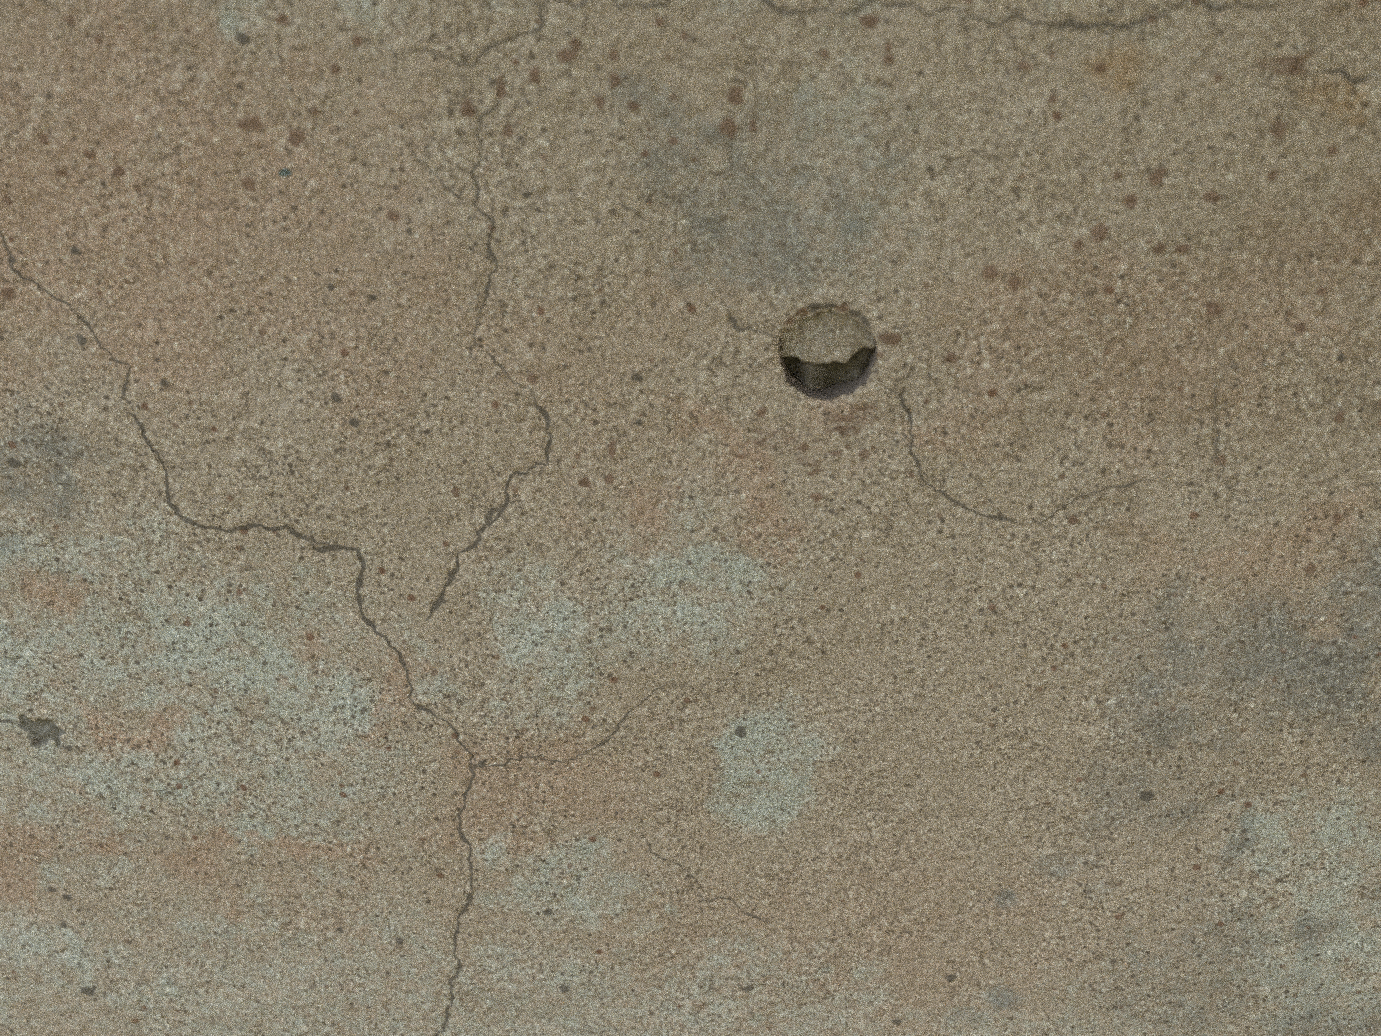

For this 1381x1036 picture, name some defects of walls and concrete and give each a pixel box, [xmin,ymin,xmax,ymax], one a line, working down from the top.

crack [757,0,1290,86]
crack [1302,67,1381,86]
crack [396,0,672,622]
crack [720,301,783,338]
spalling [792,300,873,330]
crack [881,382,1160,526]
crack [0,231,674,1036]
spalling [14,710,74,754]
crack [629,830,795,968]